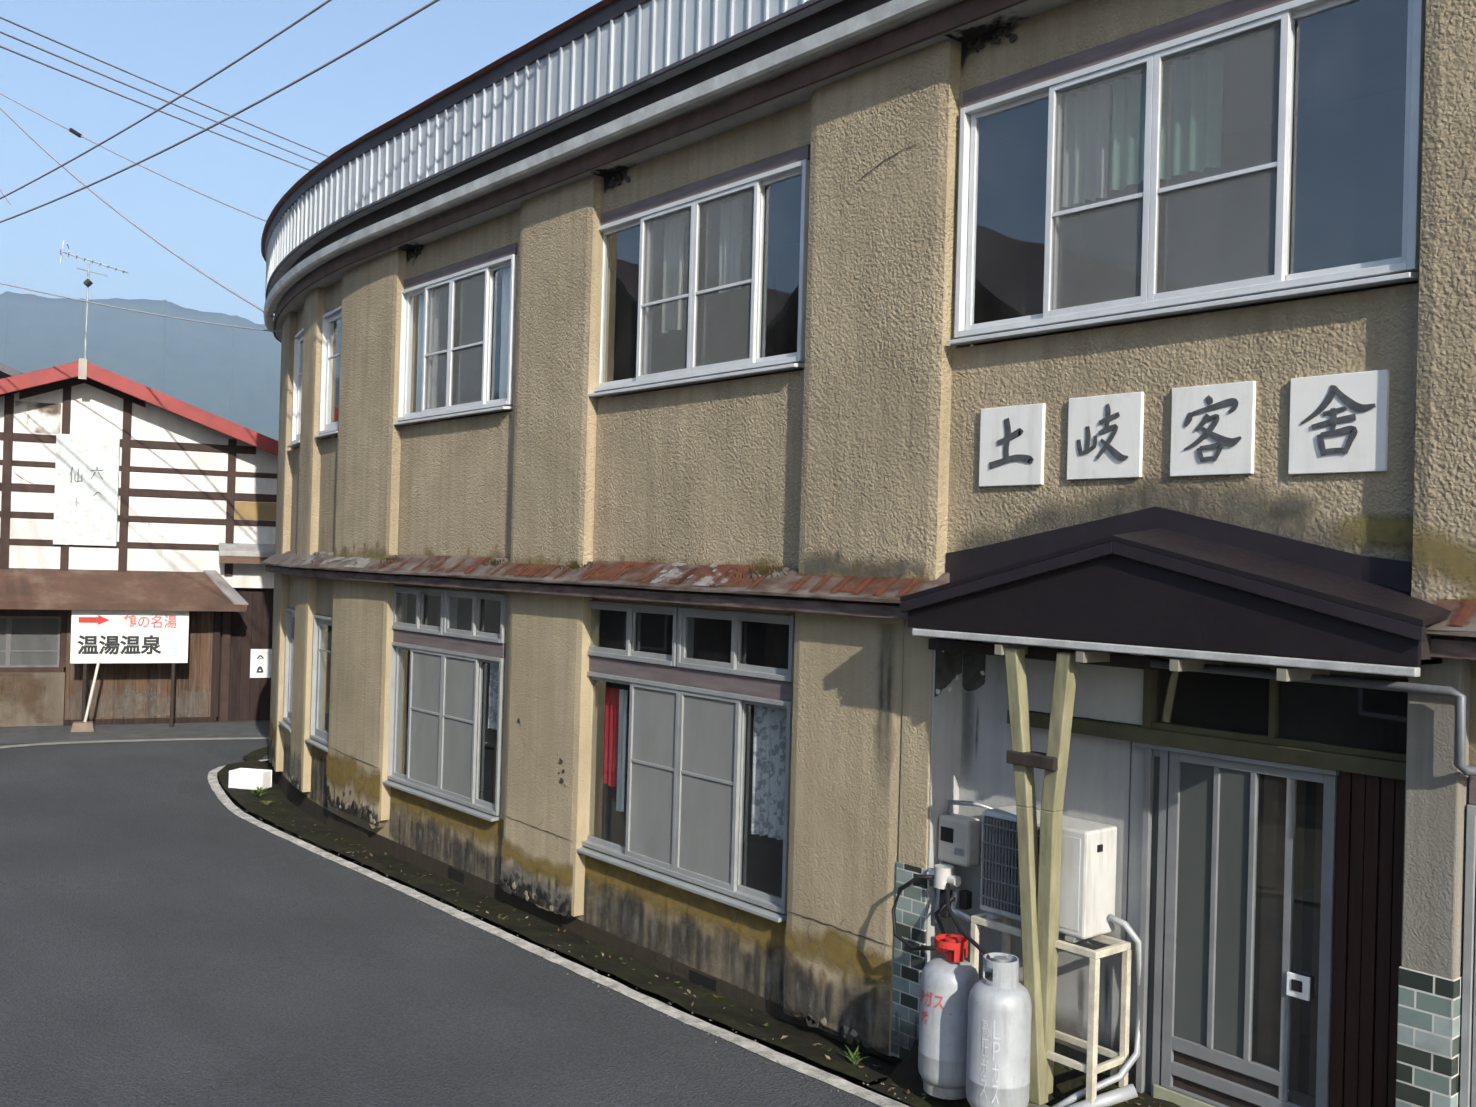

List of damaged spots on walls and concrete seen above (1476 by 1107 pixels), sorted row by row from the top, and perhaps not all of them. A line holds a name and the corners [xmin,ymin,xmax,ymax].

water stain [966,486,1349,551]
corrosion [378,555,782,588]
corrosion [790,573,922,596]
corrosion [1450,599,1476,626]
water stain [269,742,368,809]
water stain [389,811,919,1057]